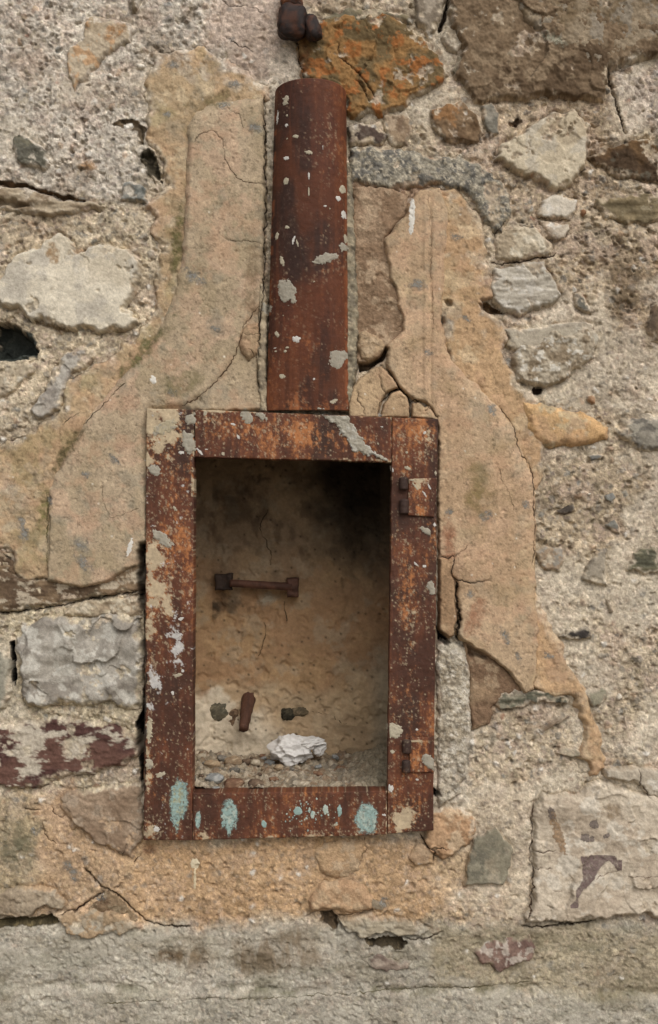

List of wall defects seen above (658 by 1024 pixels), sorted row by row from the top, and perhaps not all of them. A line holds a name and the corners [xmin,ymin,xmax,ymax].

crack [607,67,624,132]
crack [184,97,268,406]
crack [500,408,536,562]
crack [441,555,484,639]
crack [62,869,187,928]